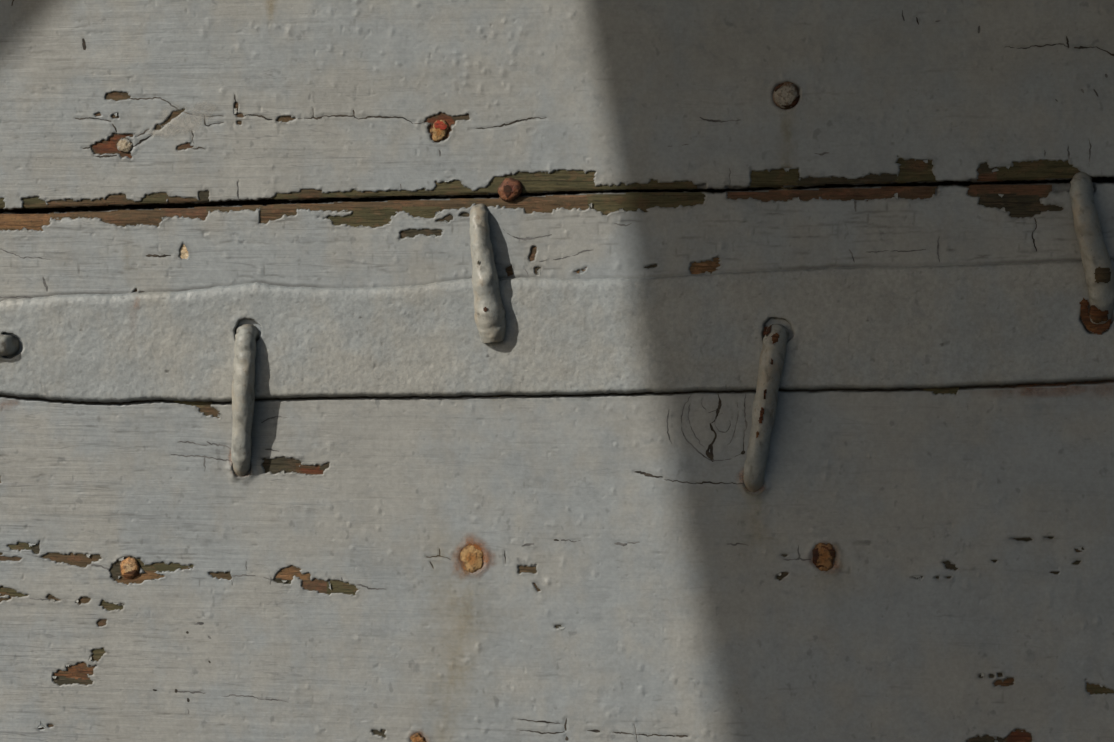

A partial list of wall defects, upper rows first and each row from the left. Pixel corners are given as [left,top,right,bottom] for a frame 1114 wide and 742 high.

crack [1007,36,1114,102]
crack [75,117,153,158]
crack [128,94,423,149]
crack [476,117,546,129]
peeling [727,156,939,203]
peeling [0,169,705,239]
rust [1079,298,1111,335]
crack [635,392,748,484]
peeling [0,541,193,585]
peeling [273,565,358,595]
rust [813,546,836,568]
peeling [51,648,105,686]